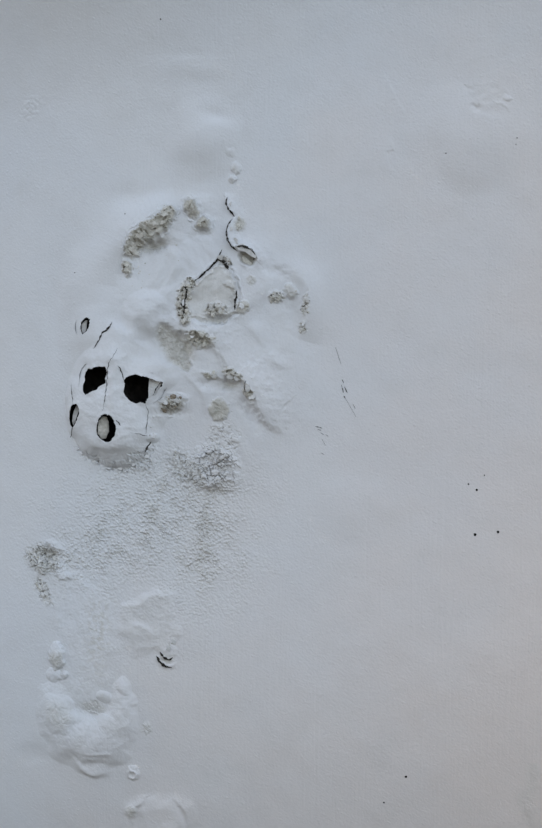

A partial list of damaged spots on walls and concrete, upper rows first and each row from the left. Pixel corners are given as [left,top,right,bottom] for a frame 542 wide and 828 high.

flaking render [105,193,216,294]
flaking render [174,145,323,353]